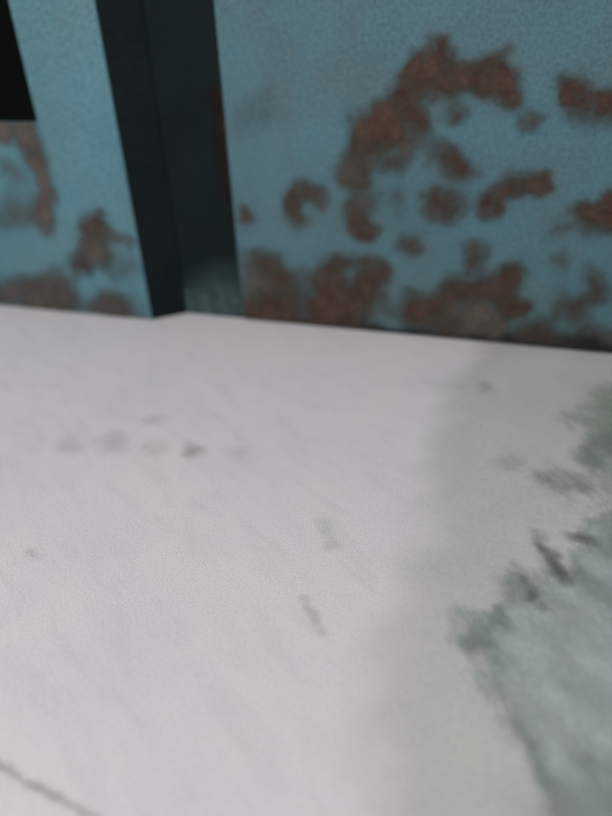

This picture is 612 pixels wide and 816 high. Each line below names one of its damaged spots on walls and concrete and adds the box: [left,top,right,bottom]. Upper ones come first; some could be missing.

corrosion [558,76,612,116]
corrosion [213,87,232,191]
corrosion [340,36,522,242]
corrosion [0,122,56,233]
corrosion [70,210,130,272]
corrosion [285,181,328,224]
corrosion [478,172,554,220]
corrosion [574,191,612,230]
corrosion [0,274,75,312]
corrosion [88,293,140,319]
corrosion [241,242,612,353]
damp [407,343,612,816]